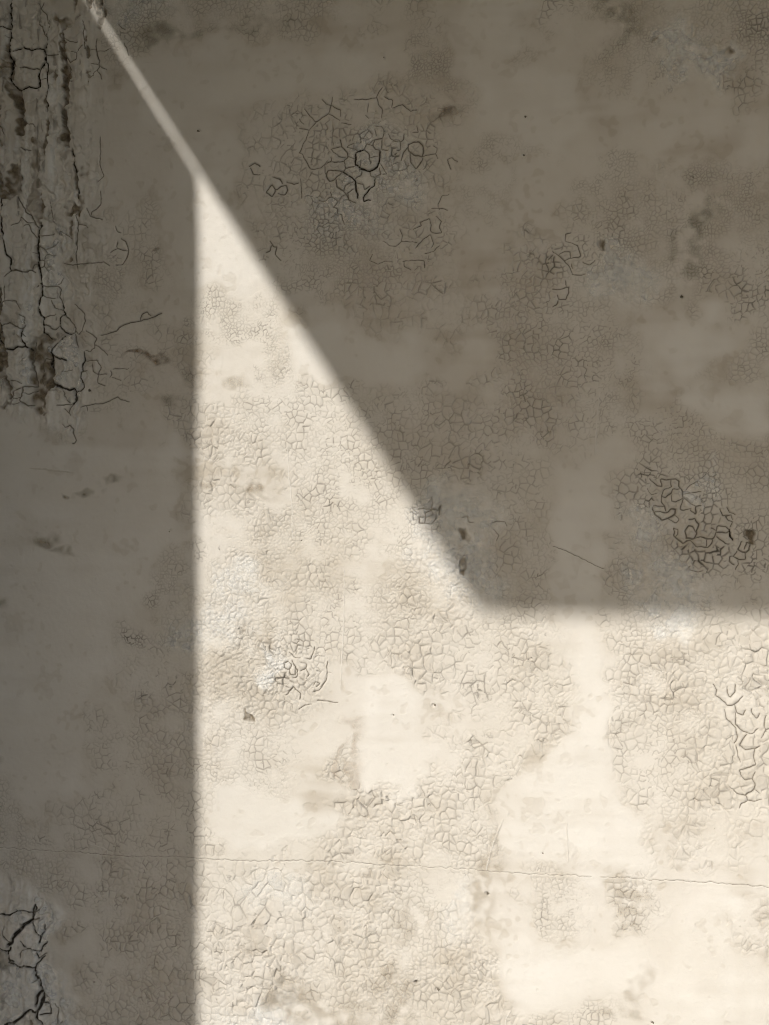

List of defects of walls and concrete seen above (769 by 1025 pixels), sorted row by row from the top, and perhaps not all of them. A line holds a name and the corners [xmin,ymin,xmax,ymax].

crack [0,3,129,151]
crack [249,88,458,222]
crack [0,140,162,444]
crack [369,195,448,270]
crack [418,497,506,541]
crack [649,479,750,572]
crack [283,647,338,708]
crack [713,684,768,808]
crack [1,904,63,1025]
peeling [0,871,79,1025]